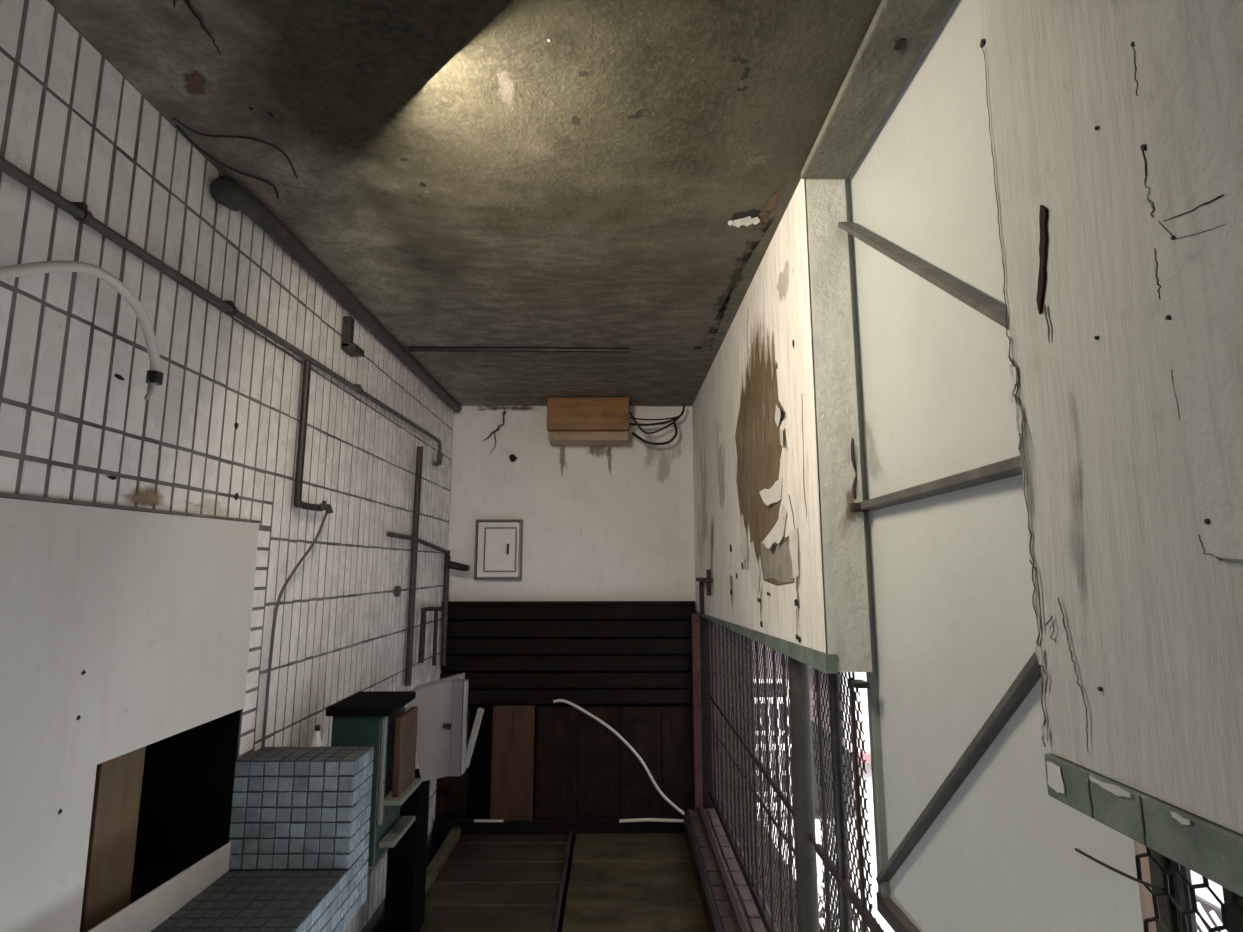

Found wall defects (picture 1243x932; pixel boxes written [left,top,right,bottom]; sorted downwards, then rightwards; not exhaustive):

crack [173,0,221,55]
rust [183,71,205,95]
crack [482,410,507,455]
crack [982,45,1093,818]
peeling [735,322,799,592]
peeling [1046,761,1065,794]
peeling [1089,775,1132,798]
peeling [1170,811,1191,825]